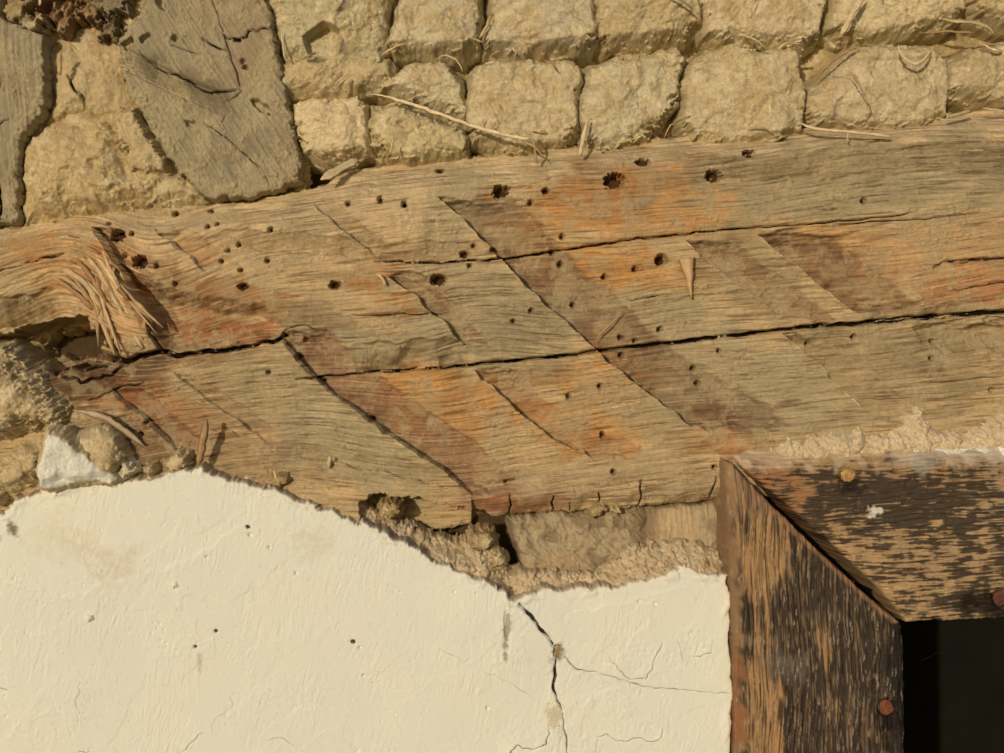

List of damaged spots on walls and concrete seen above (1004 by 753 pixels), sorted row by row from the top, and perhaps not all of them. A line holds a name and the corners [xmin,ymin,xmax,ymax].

spalling [35,421,135,496]
spalling [361,500,723,595]
crack [510,603,728,753]